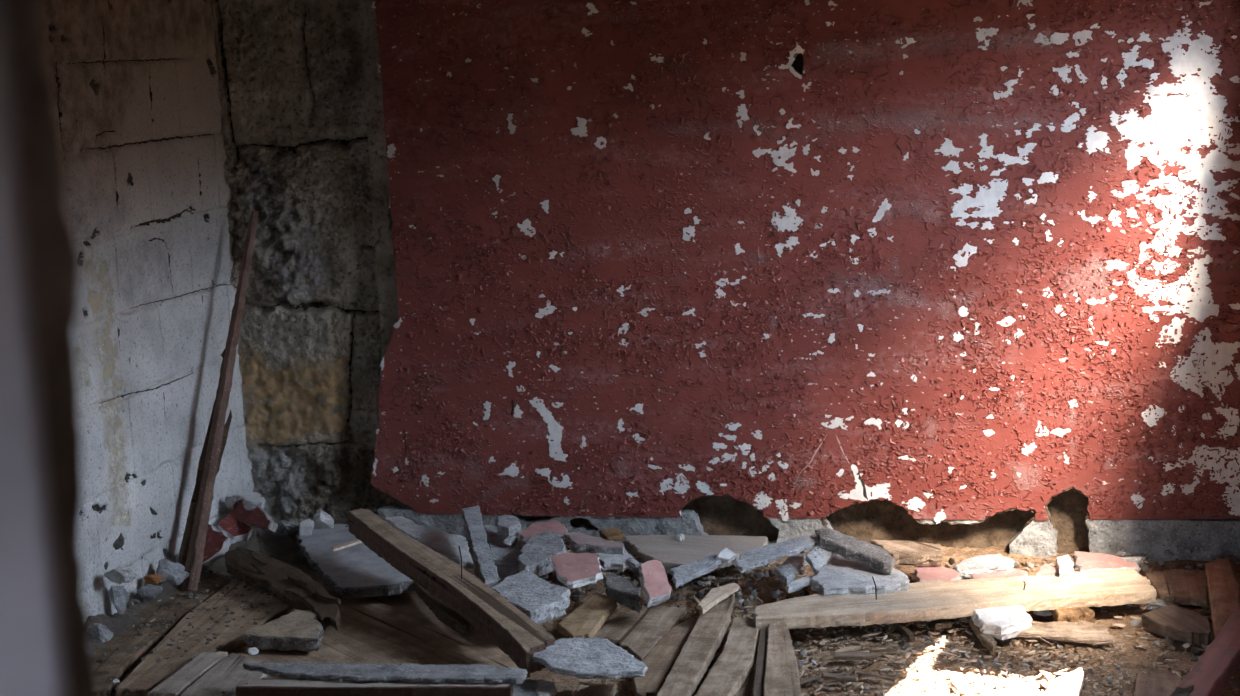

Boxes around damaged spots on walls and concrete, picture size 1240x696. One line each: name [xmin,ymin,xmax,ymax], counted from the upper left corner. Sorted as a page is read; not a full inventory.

crack [56,0,368,347]
peeling [722,87,821,176]
peeling [683,208,701,242]
peeling [714,276,747,307]
peeling [771,199,828,257]
peeling [810,198,894,275]
peeling [934,0,1240,516]
crack [91,373,193,428]
peeling [488,361,596,527]
spalling [648,415,801,541]
peeling [821,408,909,430]
spalling [820,465,1090,554]